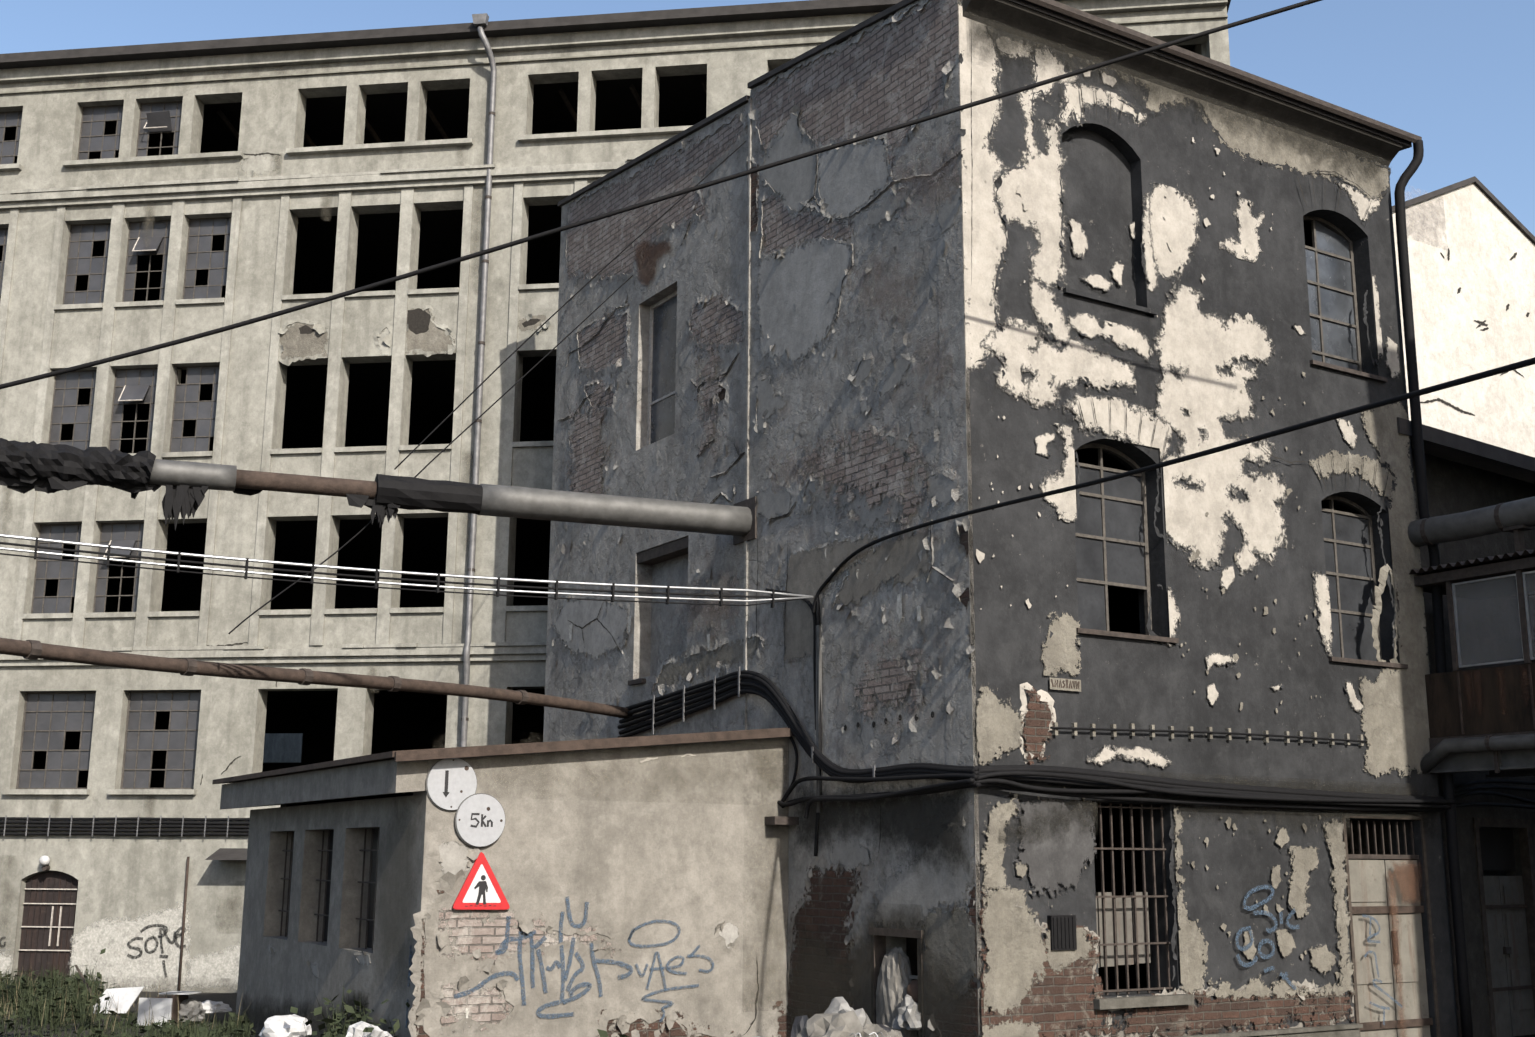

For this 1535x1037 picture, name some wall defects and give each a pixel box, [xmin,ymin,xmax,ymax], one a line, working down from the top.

crack [797,37,973,339]
flaking render [278,318,330,366]
flaking render [372,305,457,357]
flaking render [518,313,551,334]
flaking render [552,0,1431,779]
crack [568,603,624,654]
flaking render [408,833,622,1037]
flaking render [585,787,1356,1037]